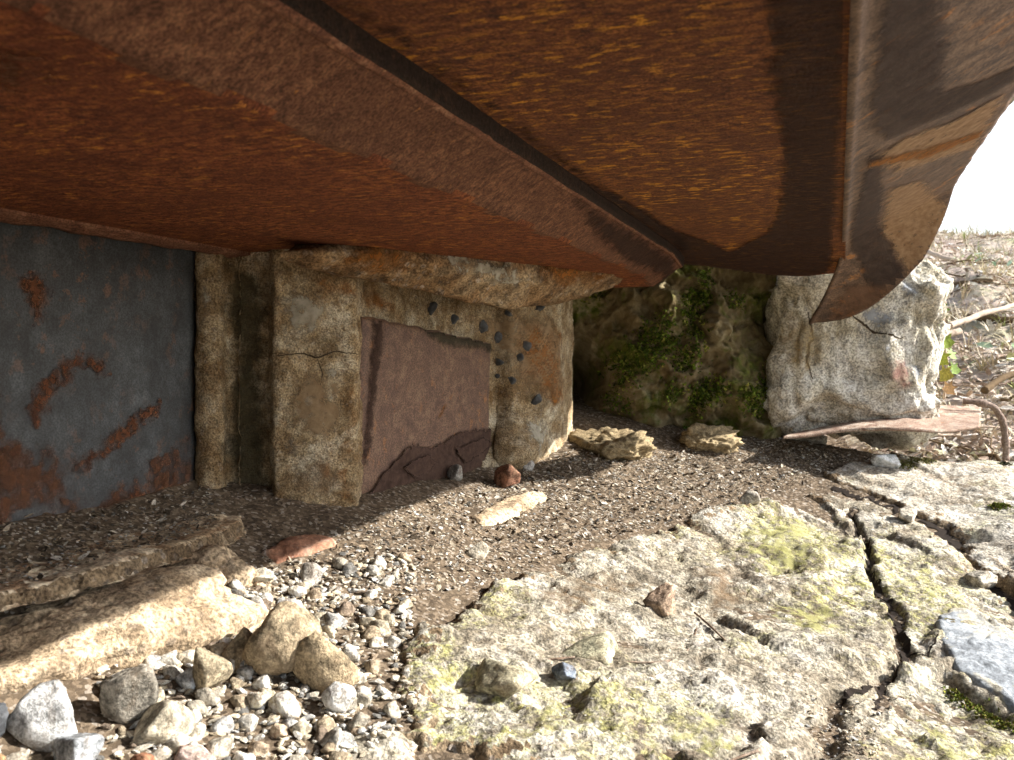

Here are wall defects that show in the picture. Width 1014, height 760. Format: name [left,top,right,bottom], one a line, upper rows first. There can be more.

corrosion [869,96,1003,172]
corrosion [882,180,946,275]
corrosion [831,286,892,318]
corrosion [27,353,112,429]
corrosion [76,398,162,470]